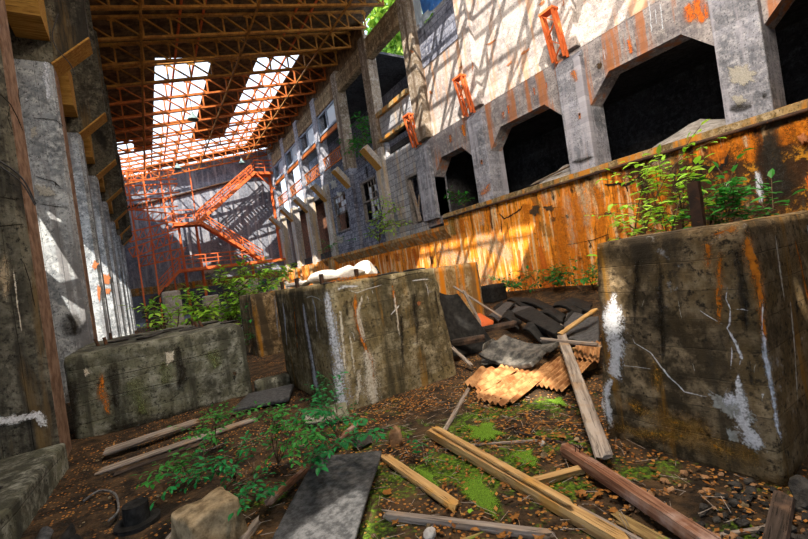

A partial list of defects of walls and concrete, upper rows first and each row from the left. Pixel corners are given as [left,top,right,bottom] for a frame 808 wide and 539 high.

rust [684,0,708,23]
rust [731,132,757,163]
rust [778,119,808,146]
rust [517,246,554,288]
rust [554,194,590,271]
rust [593,186,606,236]
water stain [657,263,665,358]
water stain [733,250,750,330]
rust [744,236,766,335]
water stain [601,297,626,429]
water stain [722,362,763,450]
water stain [761,333,781,435]